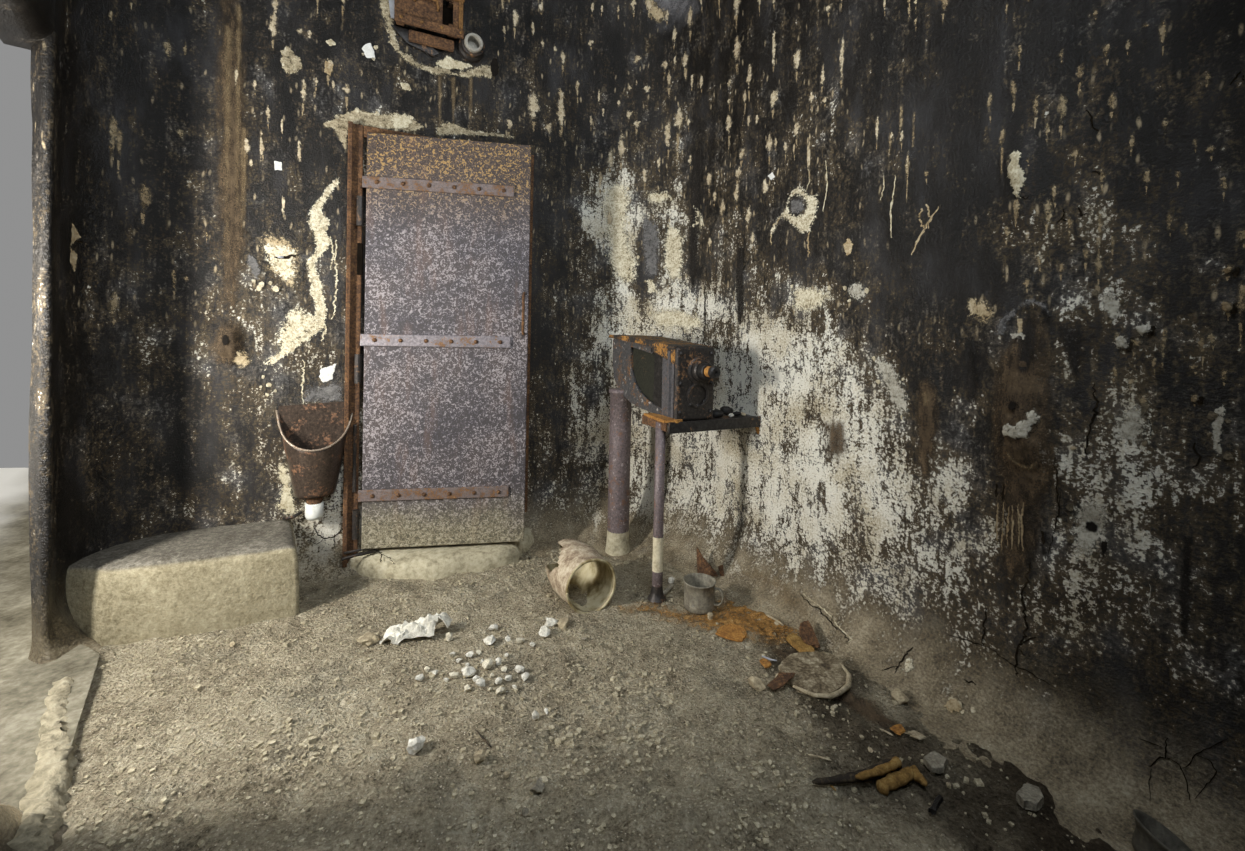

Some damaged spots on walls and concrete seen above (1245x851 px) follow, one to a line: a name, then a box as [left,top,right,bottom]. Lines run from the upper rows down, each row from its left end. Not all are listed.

damp [987,95,1004,171]
damp [1011,45,1022,111]
damp [1033,66,1082,142]
flaking render [601,180,704,293]
spalling [770,186,819,256]
damp [875,107,915,238]
damp [1045,186,1057,234]
peeling [248,178,340,403]
flaking render [790,282,869,314]
flaking render [872,356,910,420]
crack [950,384,1100,685]
crack [1141,738,1227,802]